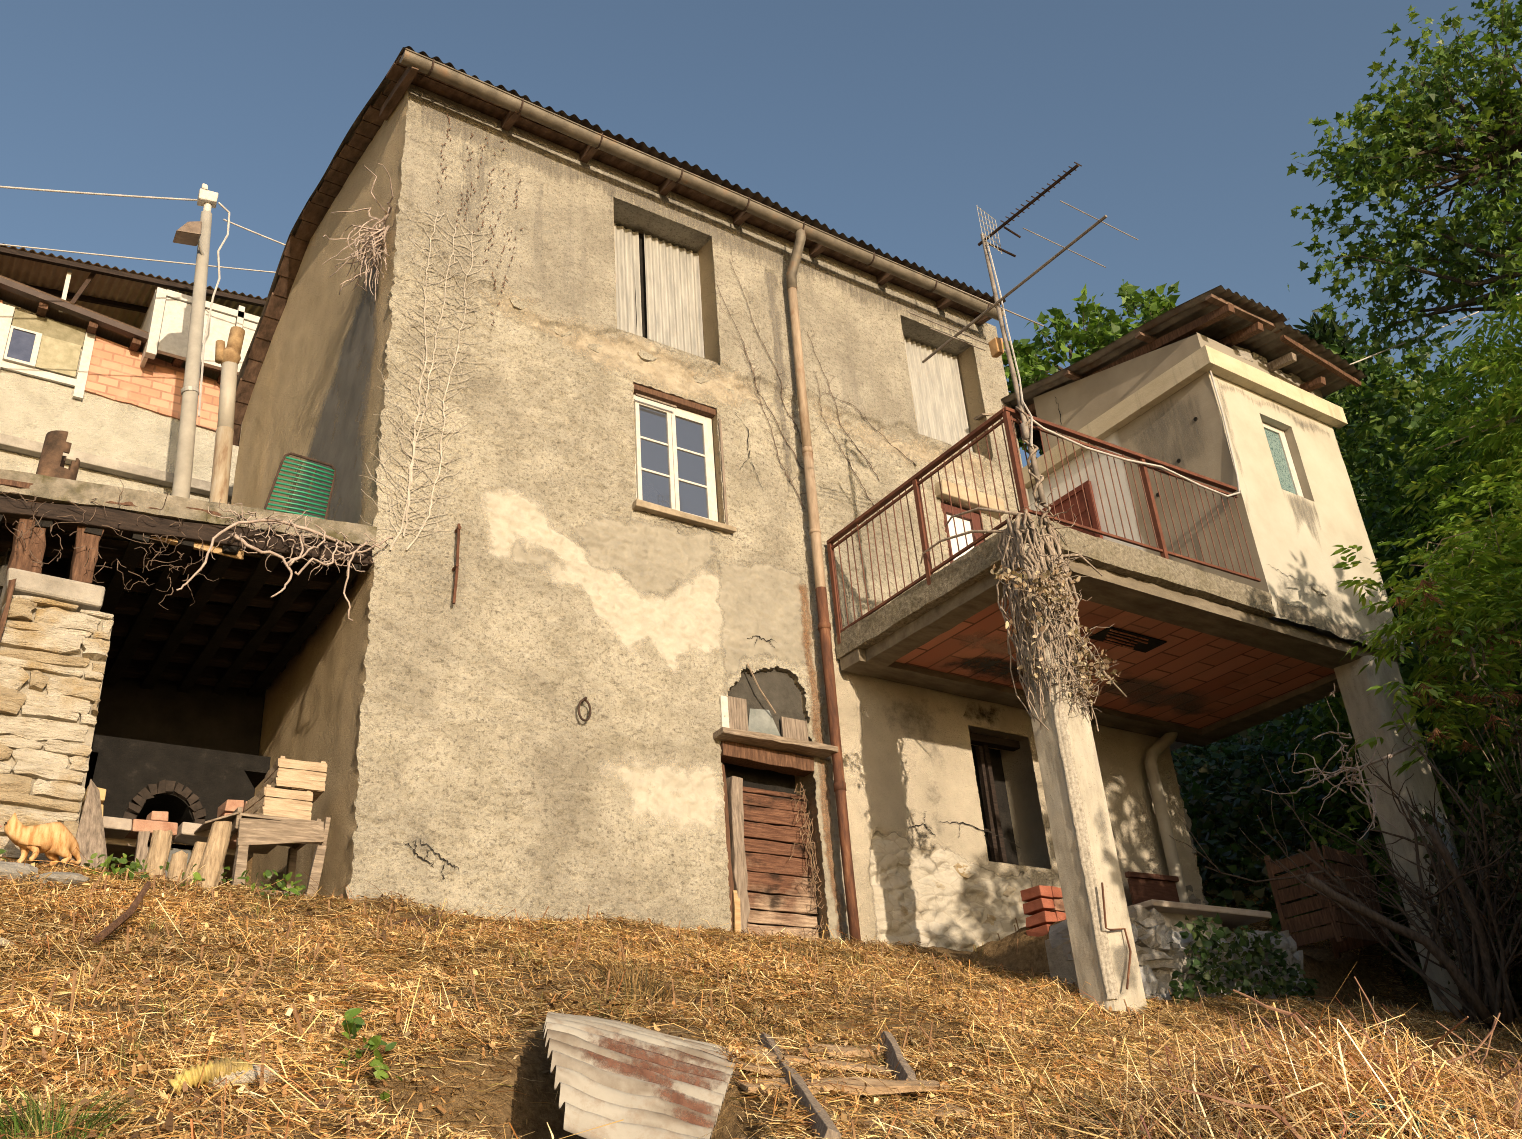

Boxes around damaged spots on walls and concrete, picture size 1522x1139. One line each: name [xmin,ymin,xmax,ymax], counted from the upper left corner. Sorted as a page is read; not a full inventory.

spalling [486,287,759,408]
crack [403,841,459,882]